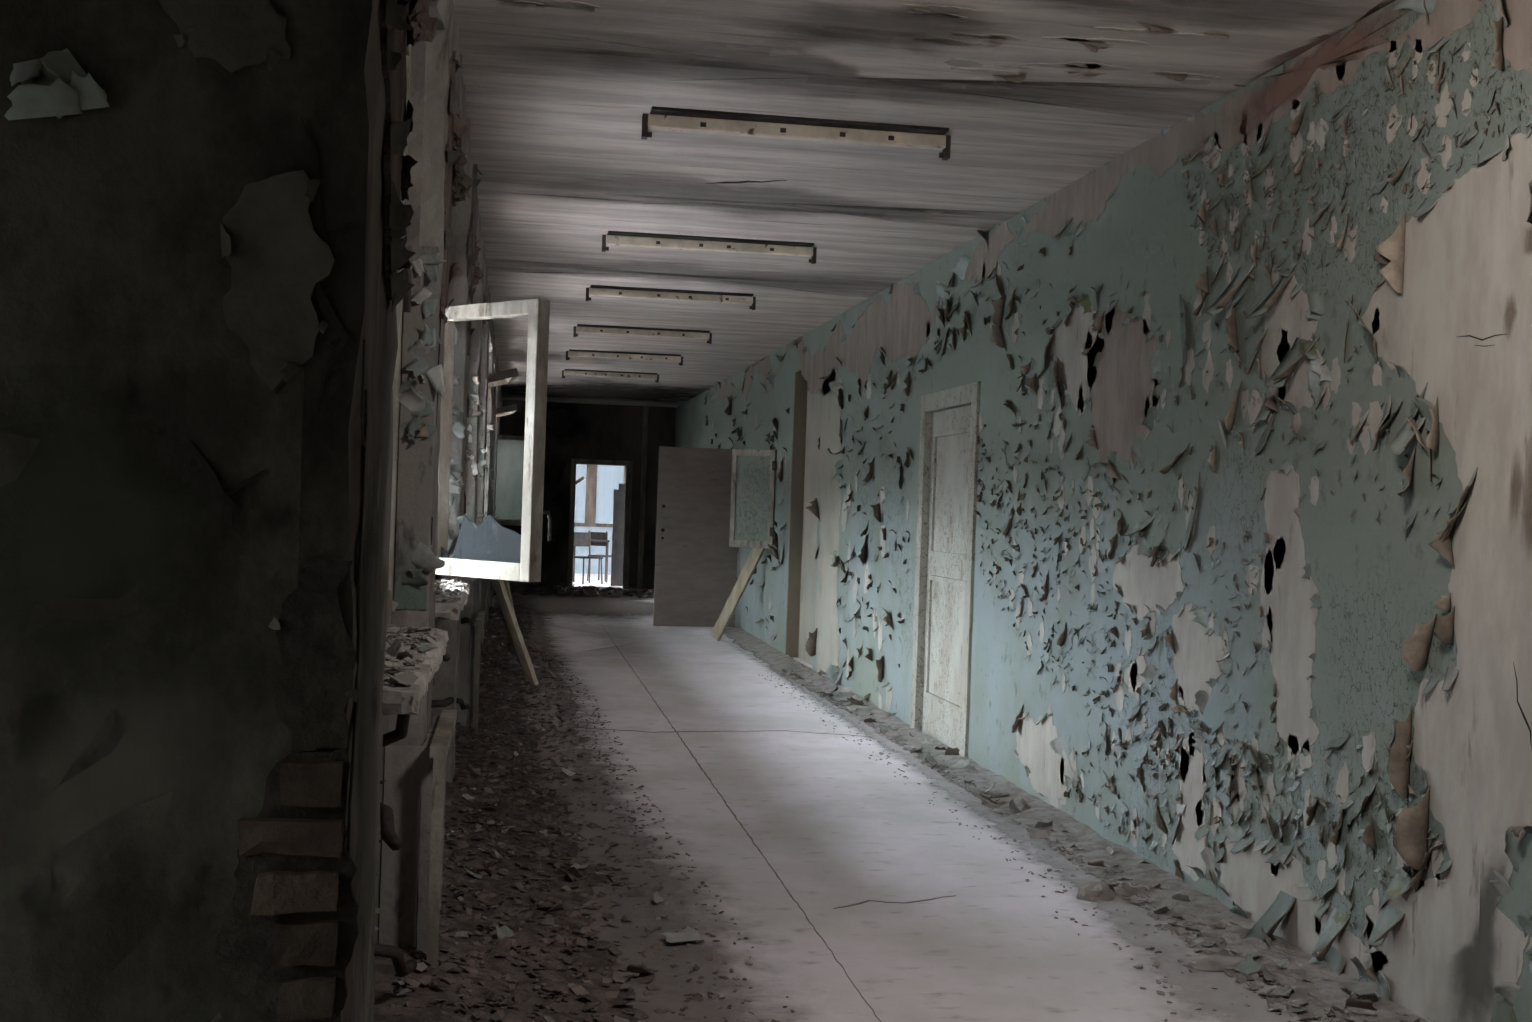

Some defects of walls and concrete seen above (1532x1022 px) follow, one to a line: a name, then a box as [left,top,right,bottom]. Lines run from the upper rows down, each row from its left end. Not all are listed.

flaking render [4,48,110,120]
flaking render [159,0,291,74]
flaking render [220,170,335,391]
peeling [704,0,1532,1022]